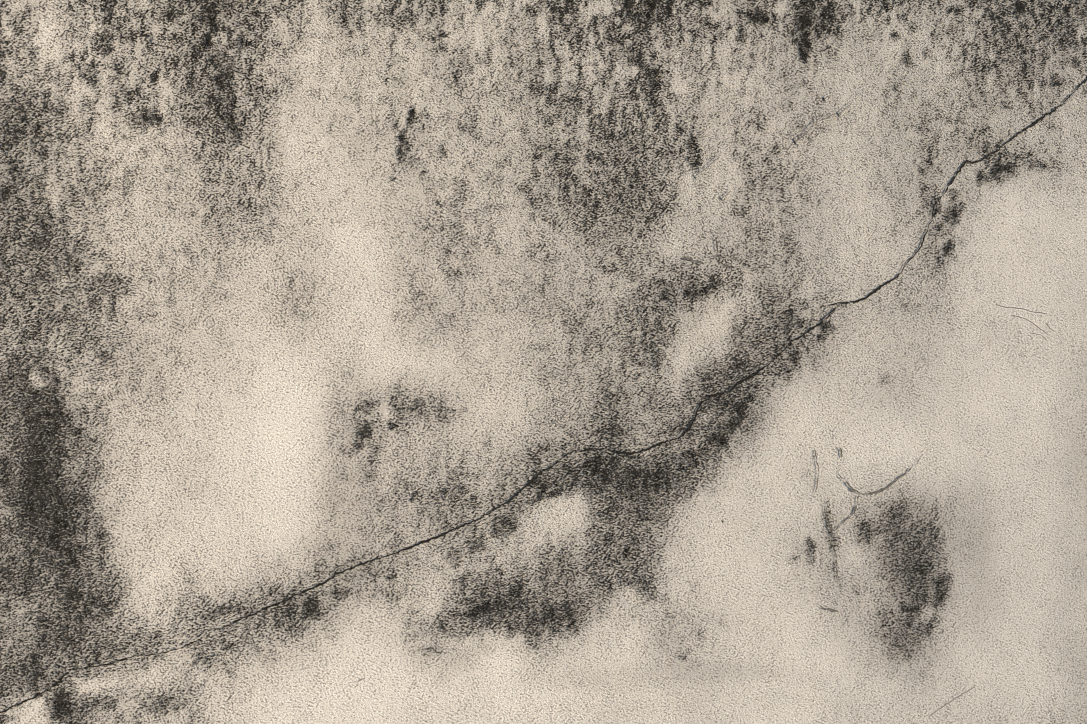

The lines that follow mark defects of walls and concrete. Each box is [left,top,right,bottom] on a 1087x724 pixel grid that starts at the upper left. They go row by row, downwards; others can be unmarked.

leakage [321,0,504,88]
crack [0,628,217,713]
leakage [0,0,420,724]
leakage [340,384,468,480]
crack [221,79,1087,632]
leakage [369,0,1087,660]